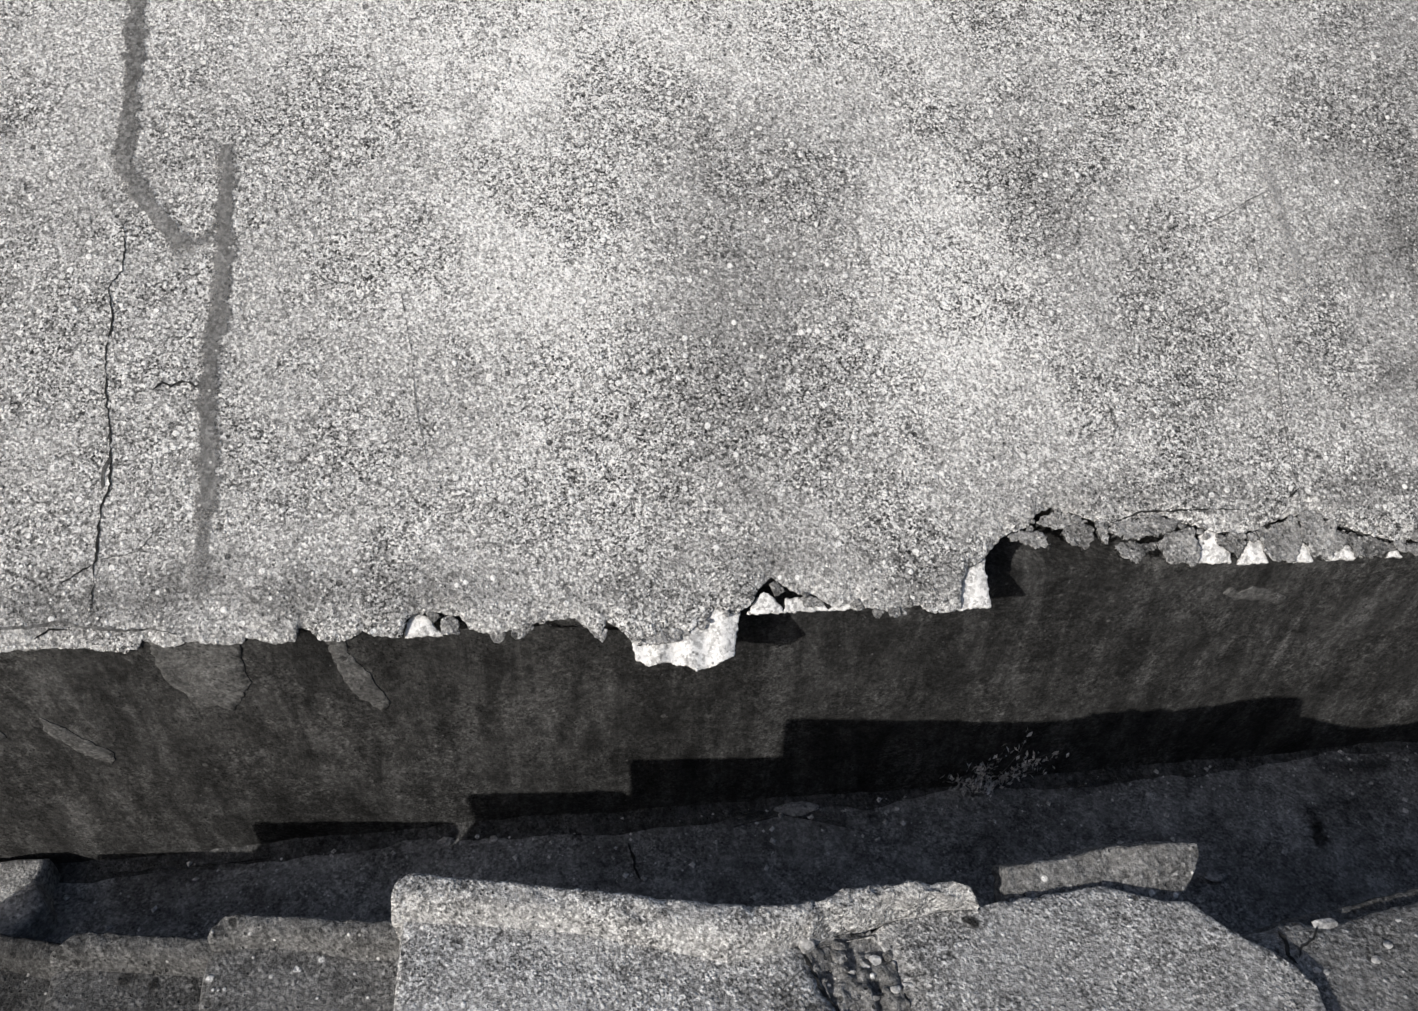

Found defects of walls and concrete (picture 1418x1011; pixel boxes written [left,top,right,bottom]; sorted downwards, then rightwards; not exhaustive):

damp [111,0,239,537]
crack [152,380,198,390]
crack [0,209,174,639]
spalling [1007,506,1418,569]
spalling [404,611,460,639]
spalling [490,620,546,643]
spalling [632,581,907,672]
spalling [957,558,991,611]
peeling [1223,586,1288,604]
peeling [148,641,252,711]
peeling [325,641,391,711]
crack [1278,928,1318,964]